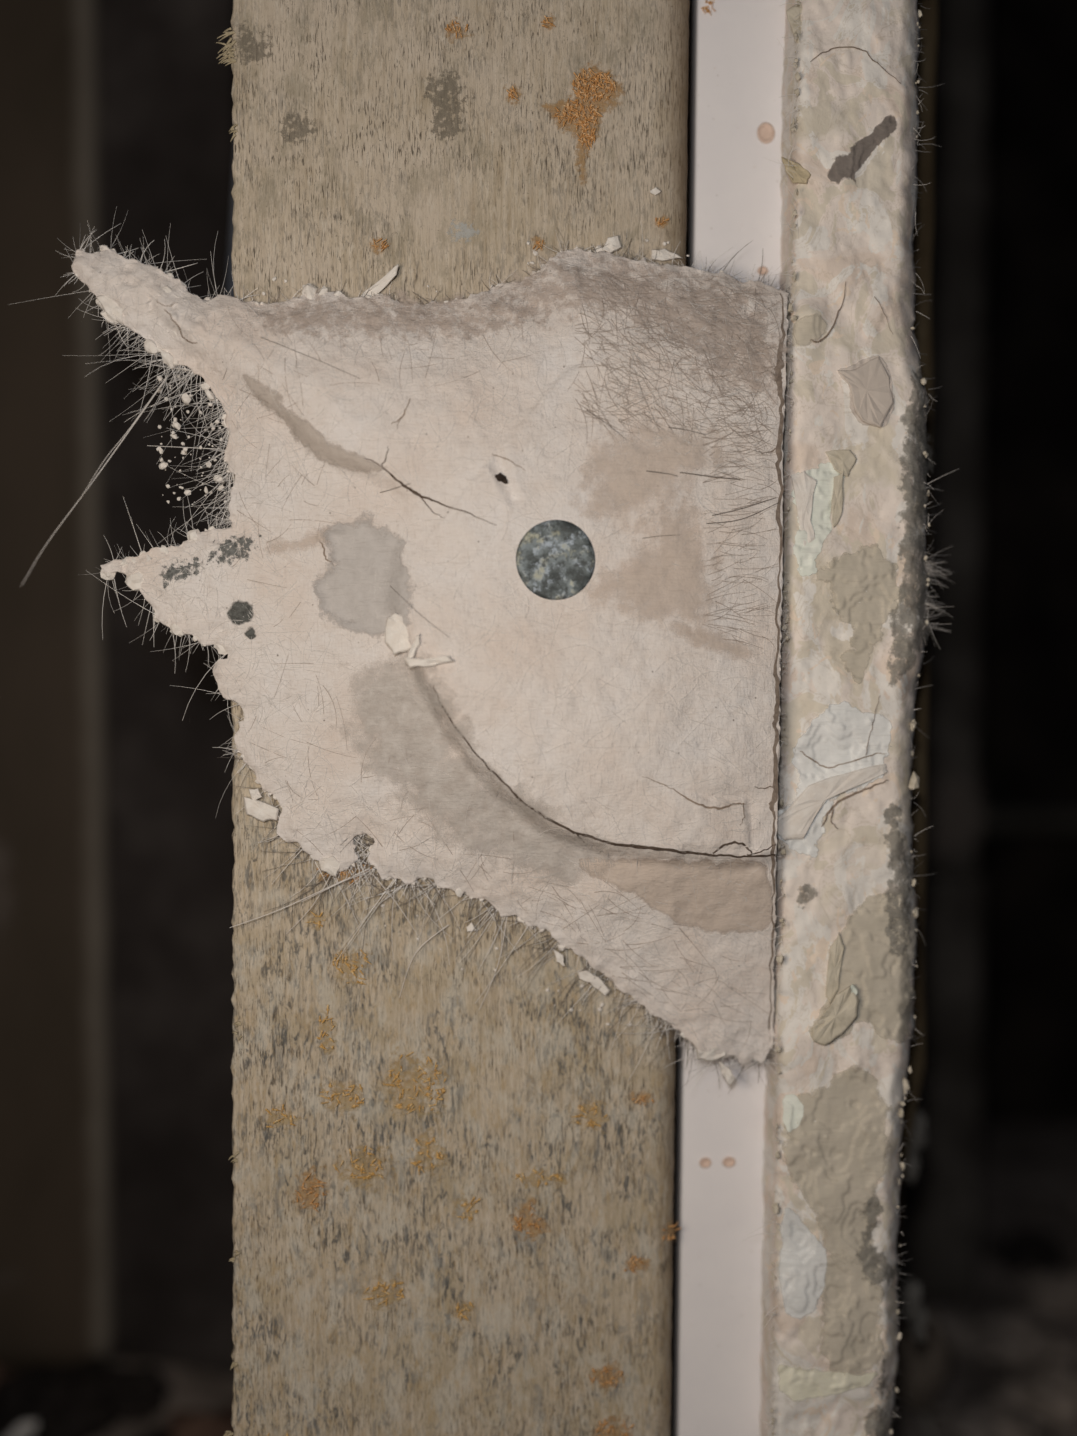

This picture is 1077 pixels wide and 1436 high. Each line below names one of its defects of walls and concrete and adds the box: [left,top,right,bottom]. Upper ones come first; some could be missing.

corrosion [543,66,623,179]
spalling [243,375,382,472]
peeling [837,356,894,427]
spalling [160,535,261,589]
spalling [227,601,256,639]
crack [433,282,892,1029]
peeling [791,450,900,684]
peeling [244,788,279,822]
peeling [776,701,892,857]
flaking render [553,949,610,996]
peeling [809,893,915,1046]
peeling [778,1067,891,1401]